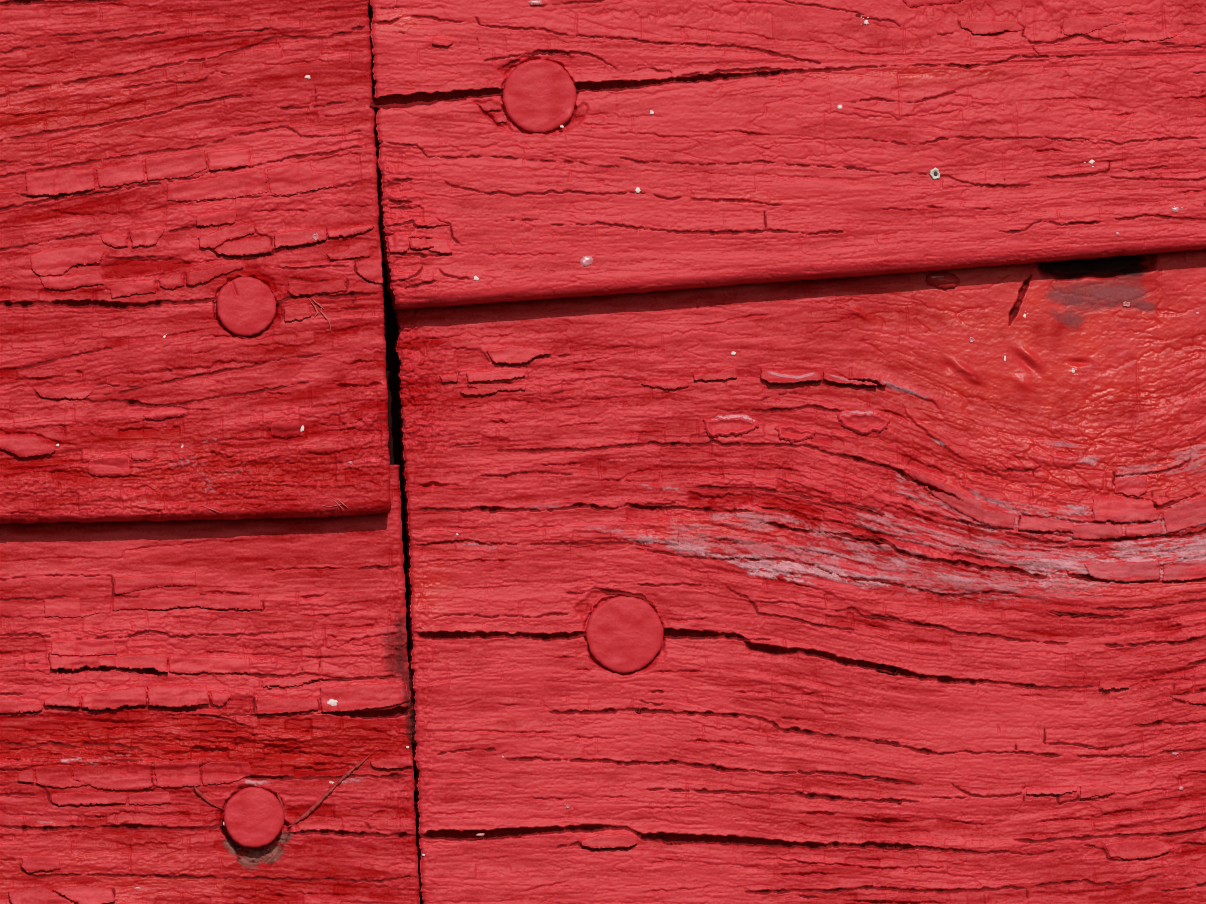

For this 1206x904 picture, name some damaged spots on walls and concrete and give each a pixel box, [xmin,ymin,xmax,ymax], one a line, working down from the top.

crack [0,0,1206,326]
peeling [25,148,453,321]
crack [716,379,886,413]
peeling [760,368,886,386]
peeling [909,468,1206,539]
crack [359,440,1206,758]
peeling [0,639,411,714]
crack [0,574,414,831]
peeling [18,761,253,806]
crack [245,748,1113,805]
peeling [0,854,147,904]
crack [289,822,1206,904]